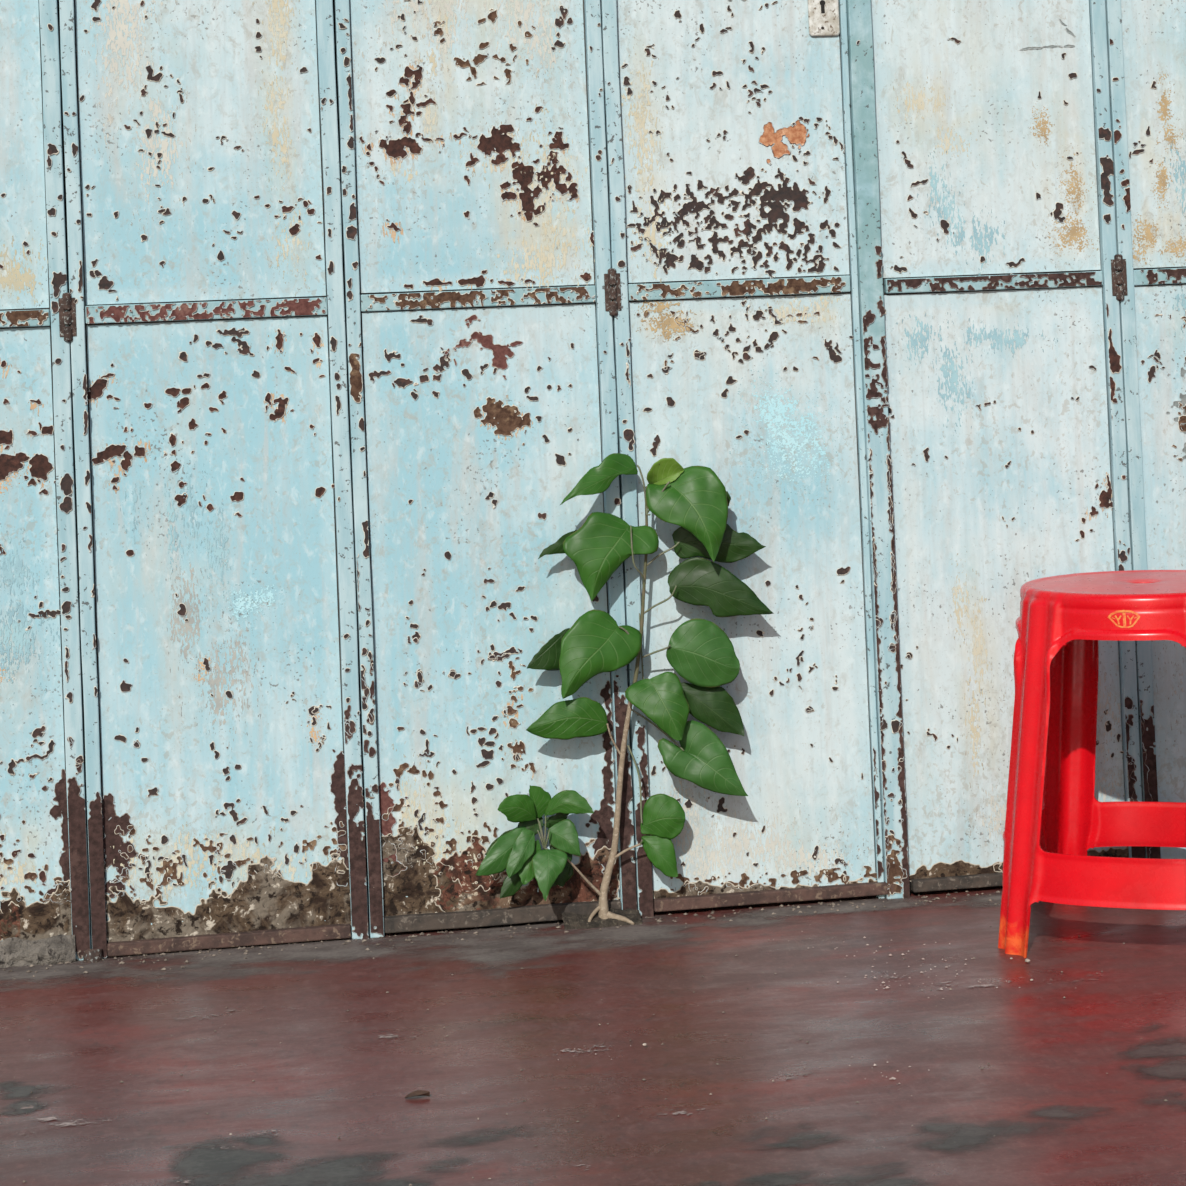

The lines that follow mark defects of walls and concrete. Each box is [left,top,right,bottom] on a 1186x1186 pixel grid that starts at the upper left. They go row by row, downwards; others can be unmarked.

corrosion [0,18,1186,959]
peeling [1140,349,1165,383]